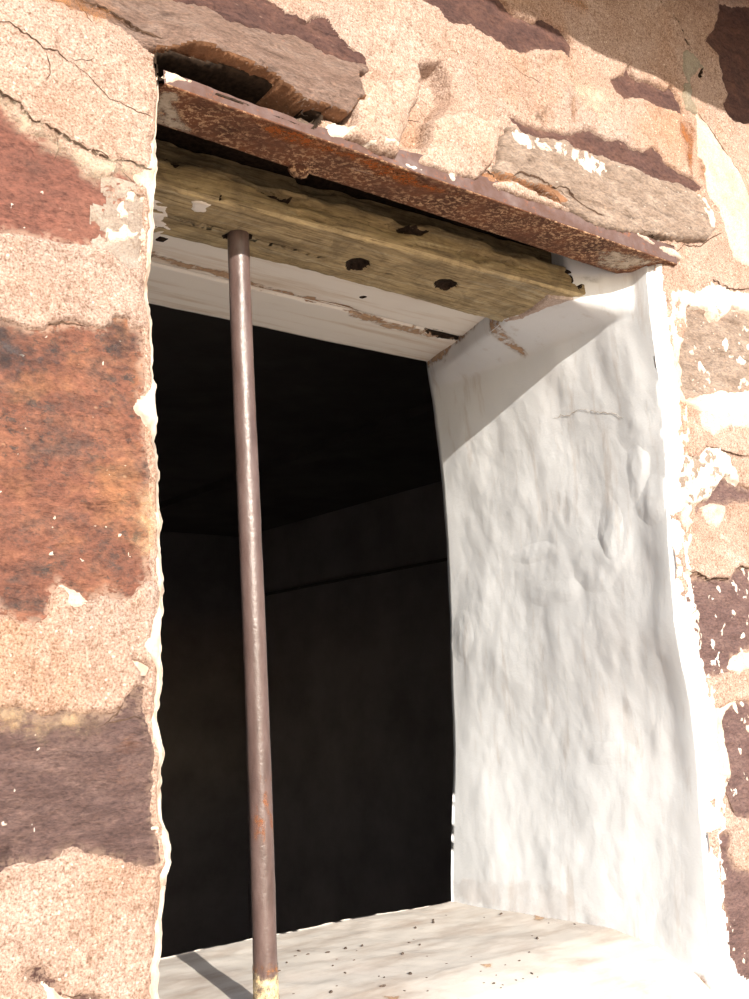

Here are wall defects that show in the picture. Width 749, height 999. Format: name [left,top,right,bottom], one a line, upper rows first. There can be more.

crack [0,21,148,115]
flaking render [0,103,151,269]
crack [0,90,152,185]
corrosion [263,126,445,193]
flaking render [508,115,702,192]
flaking render [678,308,749,400]
flaking render [695,477,749,514]
flaking render [686,567,749,677]
flaking render [722,700,749,819]
flaking render [719,831,749,980]
flaking render [26,967,100,999]